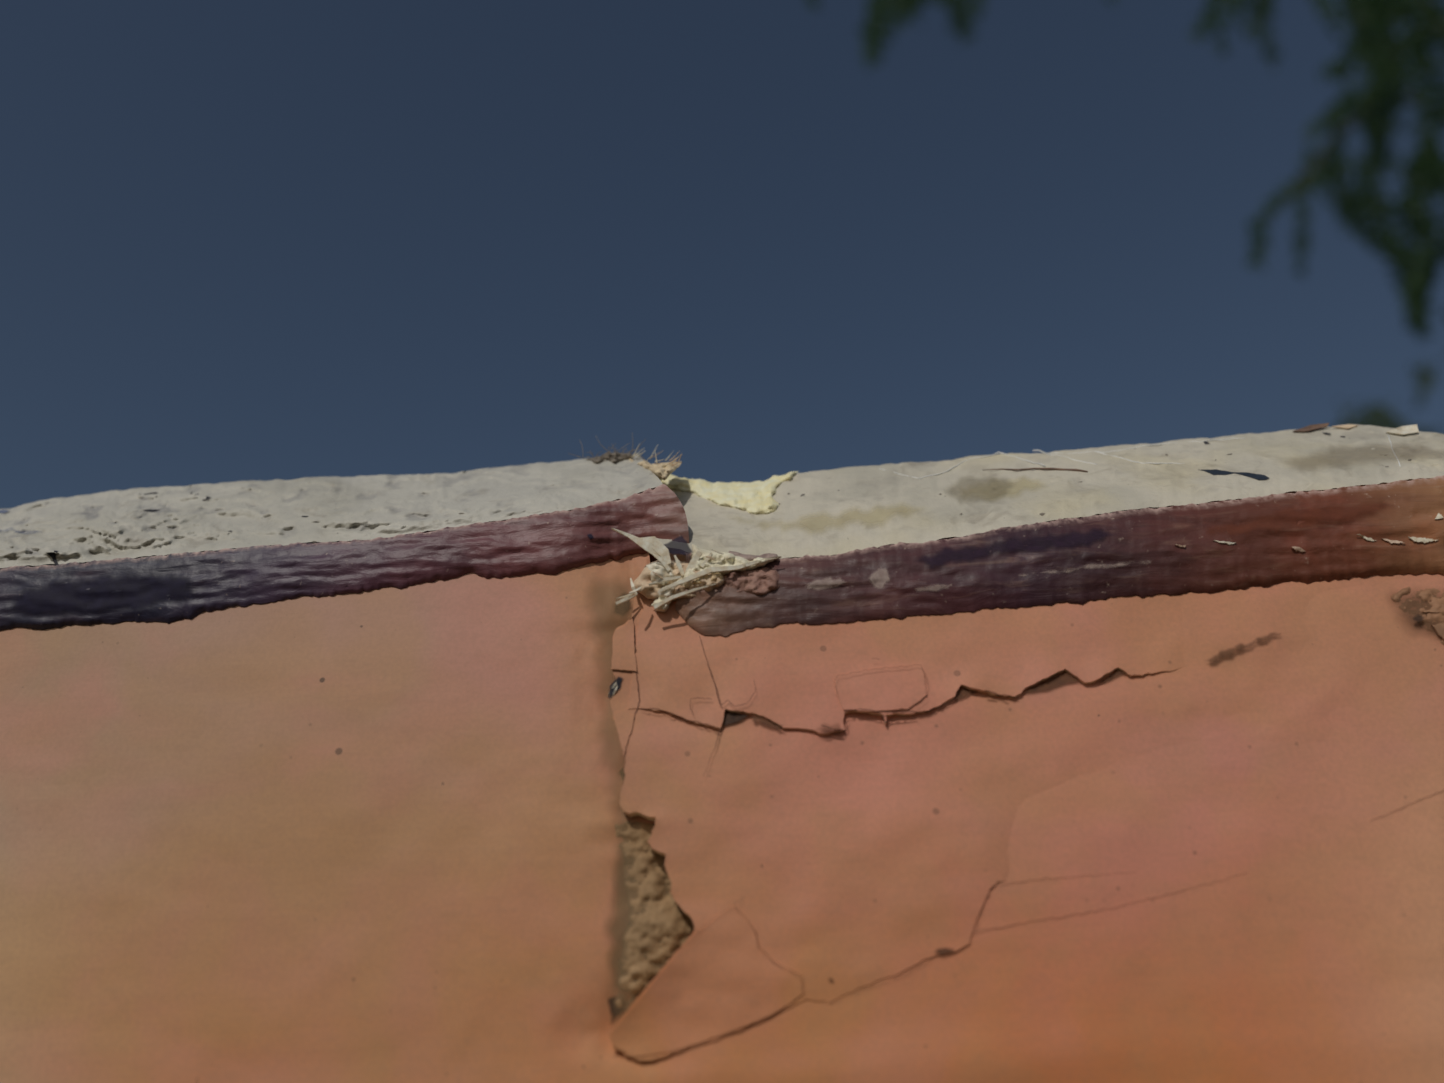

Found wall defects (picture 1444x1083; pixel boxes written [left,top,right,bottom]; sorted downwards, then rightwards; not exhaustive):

peeling [0,466,1444,1061]